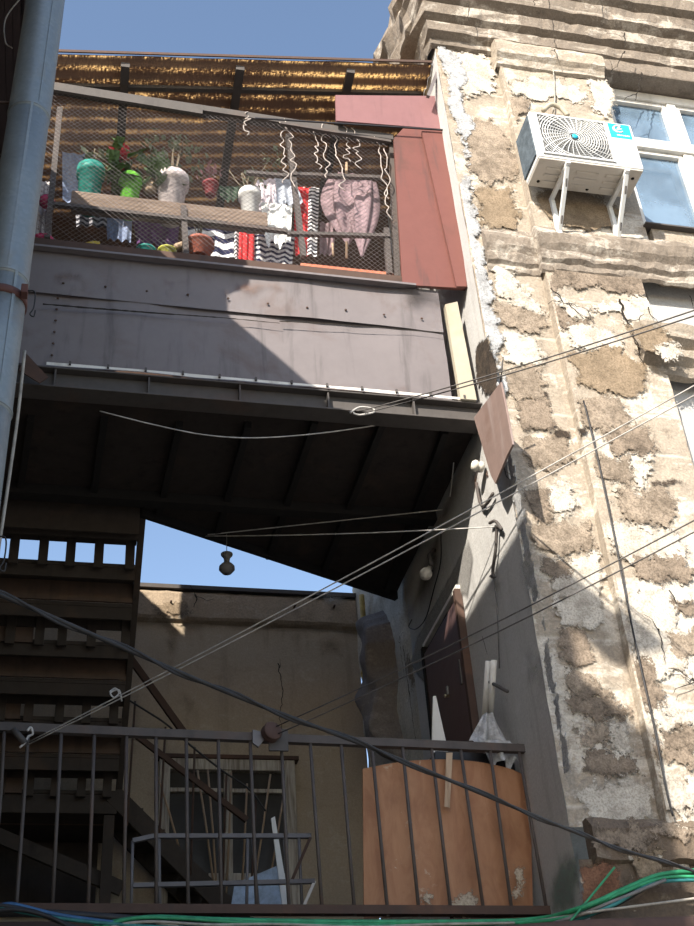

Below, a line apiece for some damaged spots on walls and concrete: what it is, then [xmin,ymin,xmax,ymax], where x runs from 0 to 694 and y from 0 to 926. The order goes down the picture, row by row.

crack [606,32,626,72]
crack [624,72,656,101]
crack [548,288,591,319]
crack [618,299,658,363]
peeling [437,46,694,903]
crack [645,615,694,692]